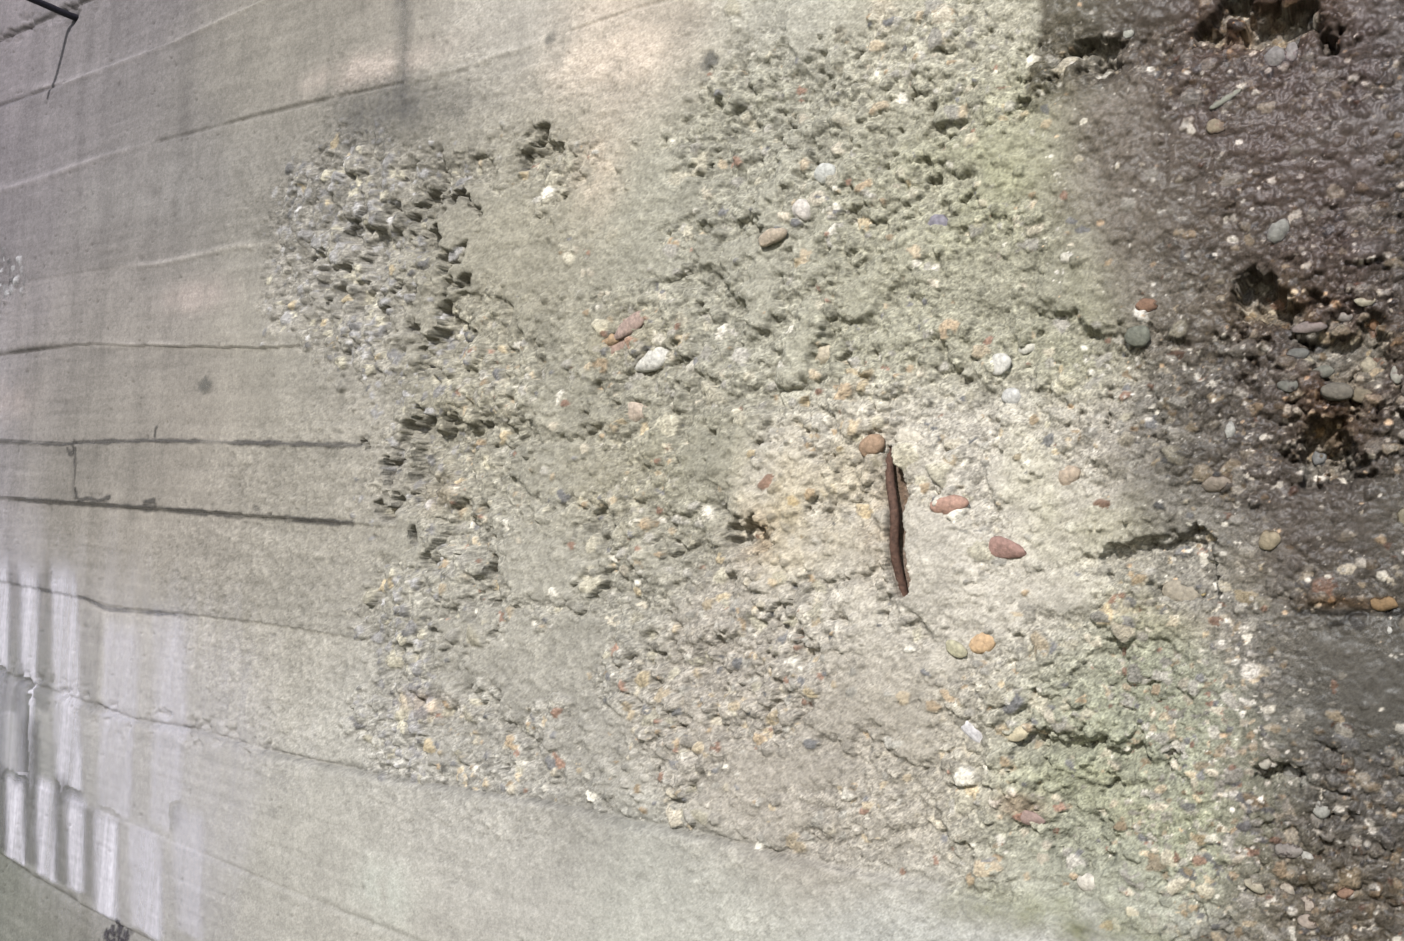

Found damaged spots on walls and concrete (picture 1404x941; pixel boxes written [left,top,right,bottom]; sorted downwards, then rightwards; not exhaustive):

hole [1191,0,1339,56]
spalling [1065,40,1123,79]
hole [519,126,565,180]
spalling [309,166,478,380]
hole [1233,268,1404,490]
spalling [381,406,503,607]
hole [727,519,775,561]
hole [1101,524,1223,603]
spalling [1024,723,1181,773]
hole [1254,762,1322,789]